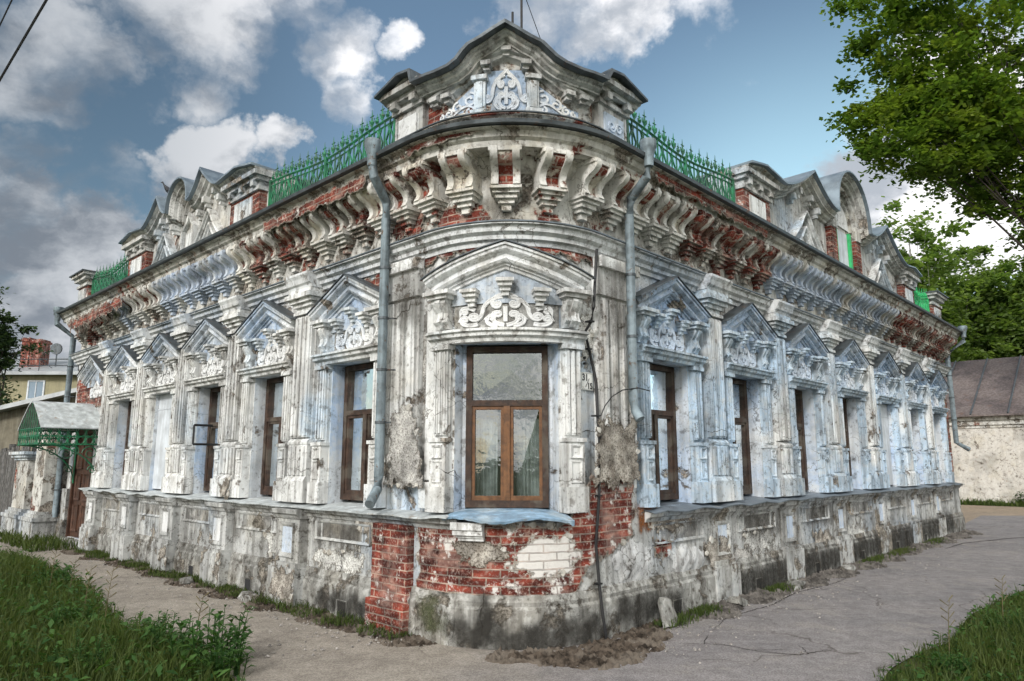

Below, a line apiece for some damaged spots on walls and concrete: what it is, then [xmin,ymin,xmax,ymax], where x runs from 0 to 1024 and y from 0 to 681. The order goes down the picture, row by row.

flaking render [263,174,366,232]
flaking render [374,203,492,241]
flaking render [424,248,476,273]
flaking render [531,246,593,267]
flaking render [383,312,429,493]
flaking render [415,413,695,596]
peeling [312,521,373,577]
water stain [741,558,788,595]
water stain [805,547,841,574]
water stain [853,513,954,560]
water stain [451,595,604,650]
water stain [616,591,683,627]